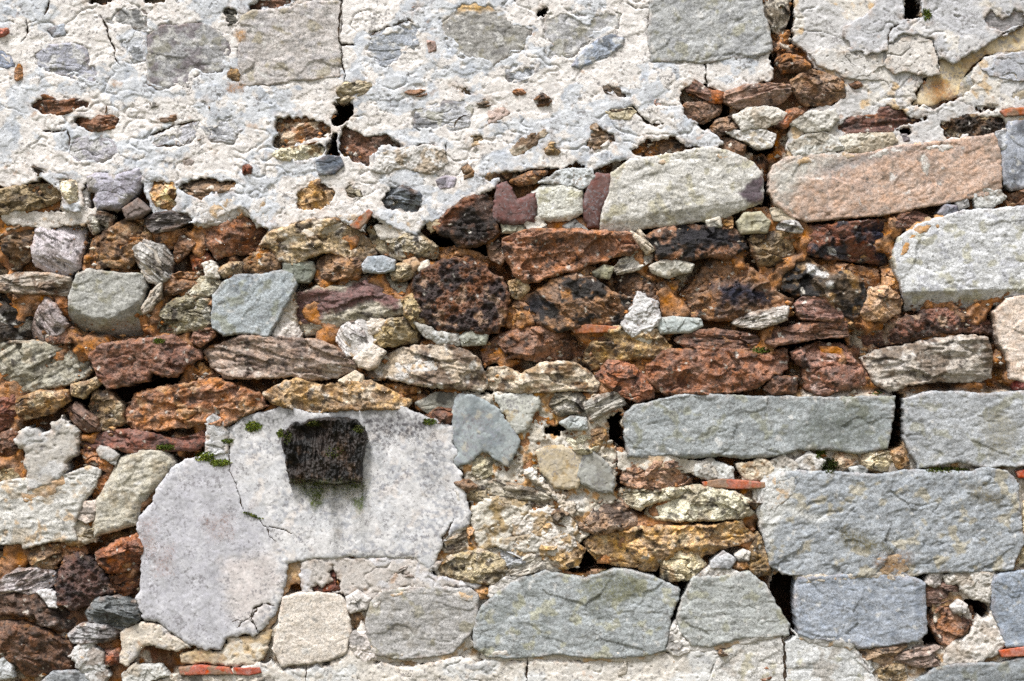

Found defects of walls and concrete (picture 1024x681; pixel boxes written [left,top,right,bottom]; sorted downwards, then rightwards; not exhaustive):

crack [337,0,412,79]
peeling [808,0,1024,106]
spalling [315,105,354,176]
spalling [242,164,253,176]
spalling [436,164,475,189]
spalling [748,148,804,234]
spalling [201,260,222,279]
spalling [140,281,164,315]
spalling [110,377,181,402]
spalling [338,370,365,386]
crack [228,444,292,541]
damp [298,482,364,509]